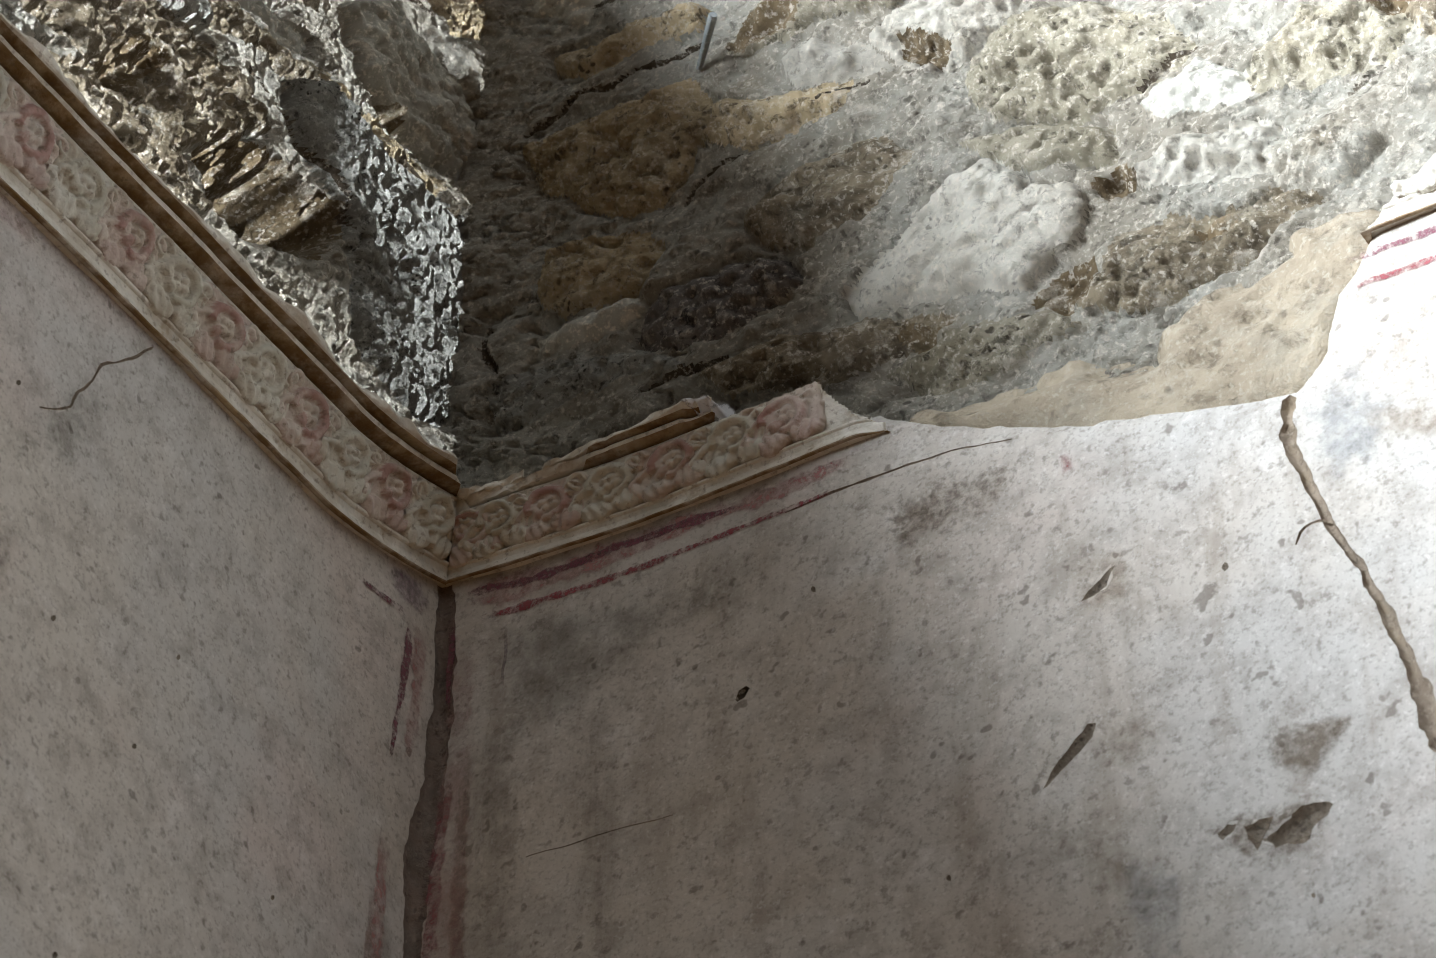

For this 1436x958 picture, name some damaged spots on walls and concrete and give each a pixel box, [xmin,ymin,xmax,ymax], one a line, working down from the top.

flaking render [0,0,1436,489]
crack [39,347,153,410]
crack [1279,395,1436,752]
flaking render [1043,723,1096,789]
flaking render [1217,802,1333,850]